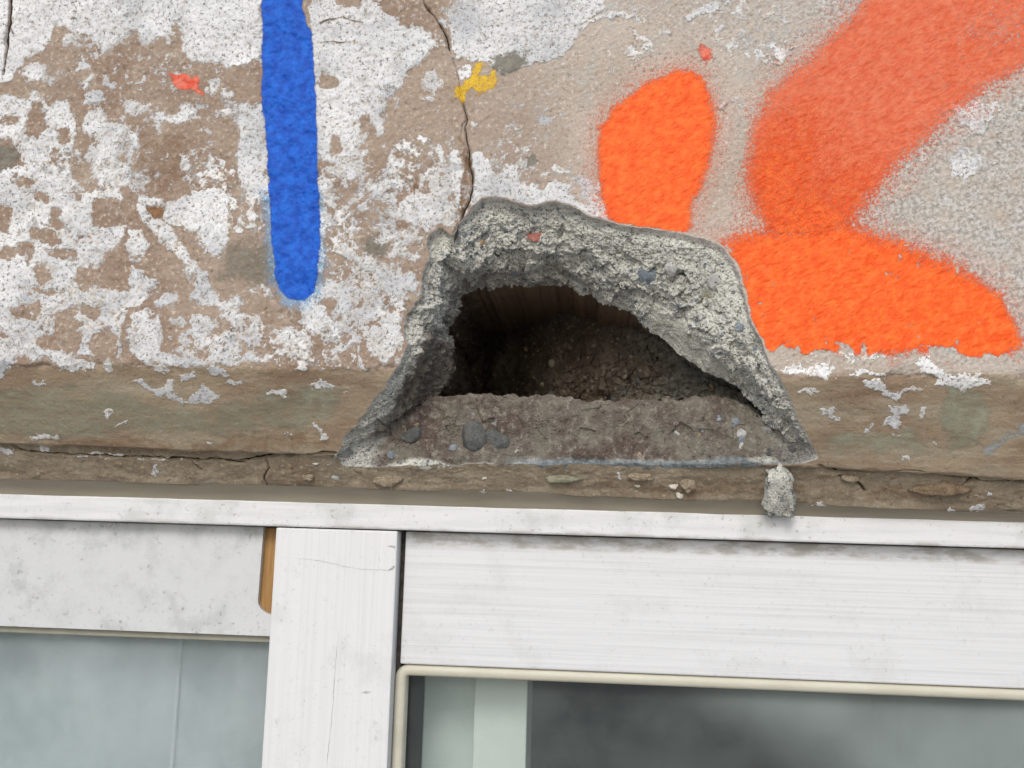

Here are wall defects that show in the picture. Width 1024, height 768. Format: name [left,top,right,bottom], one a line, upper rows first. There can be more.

crack [423,1,474,243]
spalling [0,0,992,482]
peeling [935,100,1023,185]
crack [17,446,273,485]